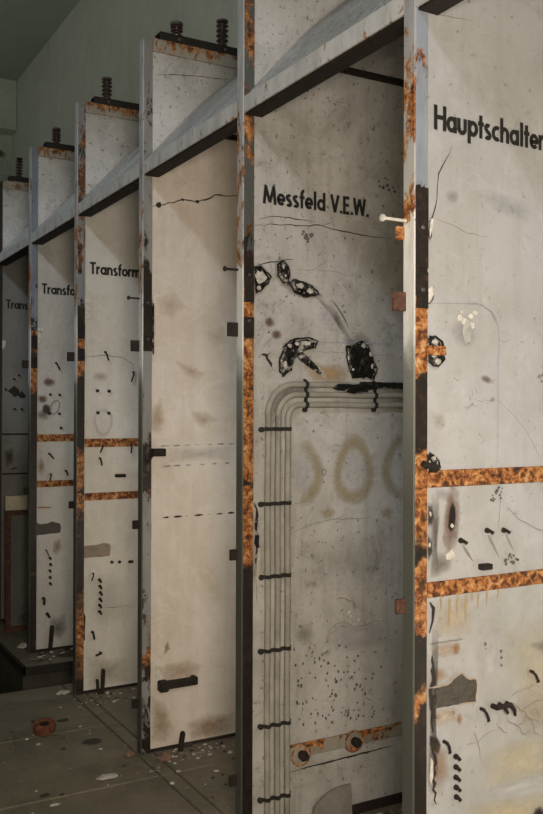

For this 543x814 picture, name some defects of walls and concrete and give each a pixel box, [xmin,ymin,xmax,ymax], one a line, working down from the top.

crack [152,194,237,207]
crack [429,146,482,237]
crack [255,216,389,239]
spalling [254,260,319,298]
spalling [278,337,321,377]
spalling [345,341,378,380]